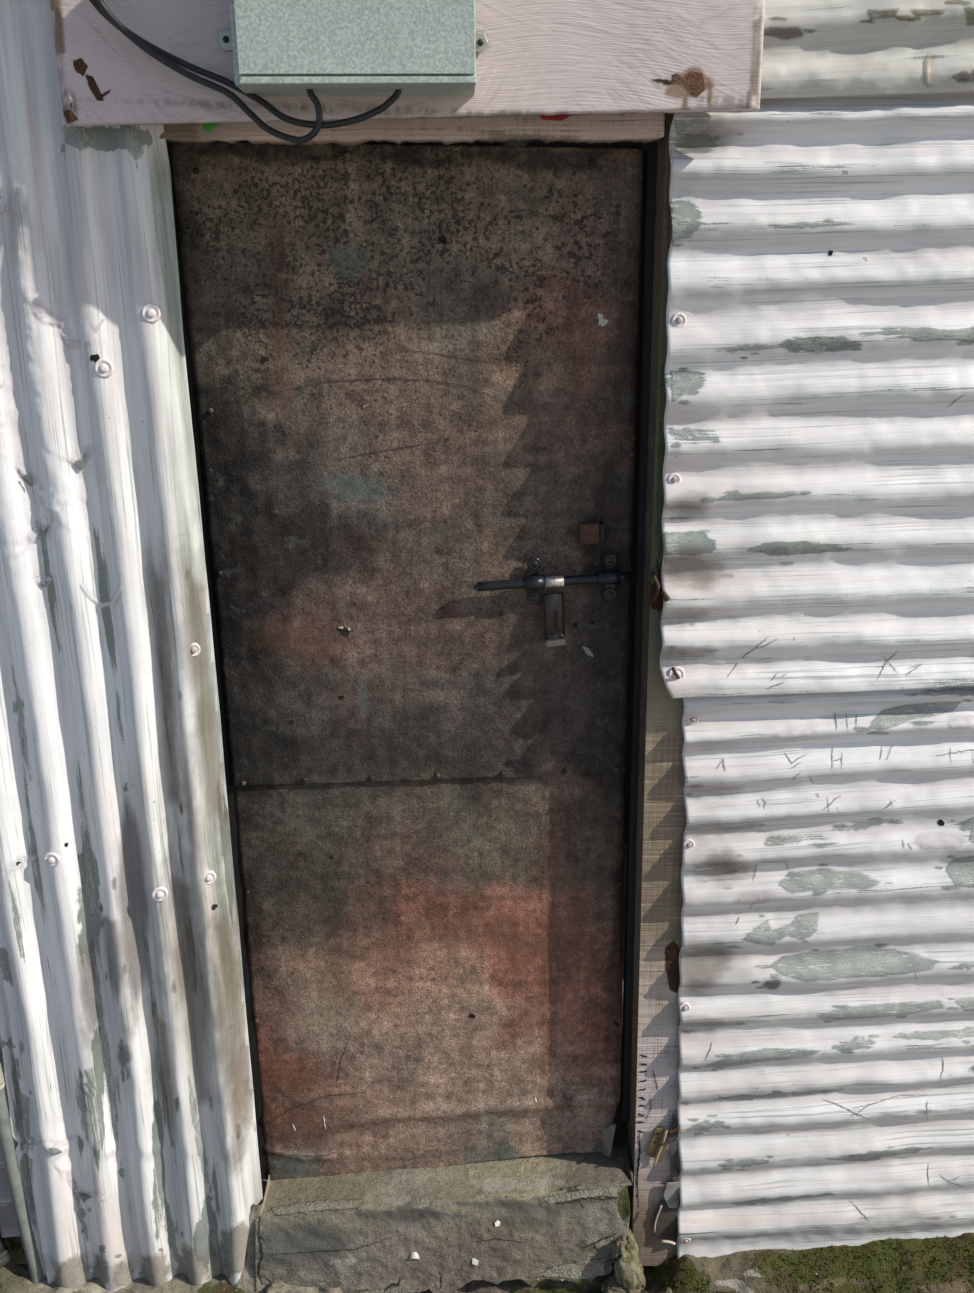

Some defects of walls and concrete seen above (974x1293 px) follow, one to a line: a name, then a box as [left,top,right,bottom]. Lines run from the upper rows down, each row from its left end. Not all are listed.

peeling [861,0,974,25]
corrosion [50,0,111,101]
corrosion [652,67,713,108]
corrosion [650,566,663,611]
peeling [854,688,974,735]
peeling [744,912,974,981]
peeling [818,999,974,1044]
peeling [694,1035,877,1071]
peeling [681,1088,843,1136]
peeling [827,1147,932,1161]
peeling [732,1193,835,1205]
peeling [163,1197,183,1267]